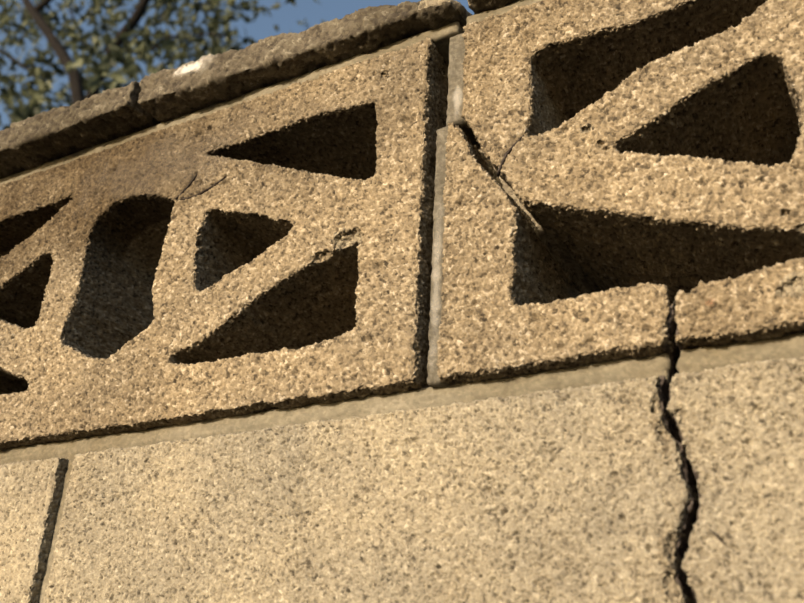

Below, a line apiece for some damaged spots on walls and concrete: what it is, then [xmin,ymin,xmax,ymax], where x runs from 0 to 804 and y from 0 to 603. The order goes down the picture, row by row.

crack [474,135,599,295]
crack [657,306,701,603]